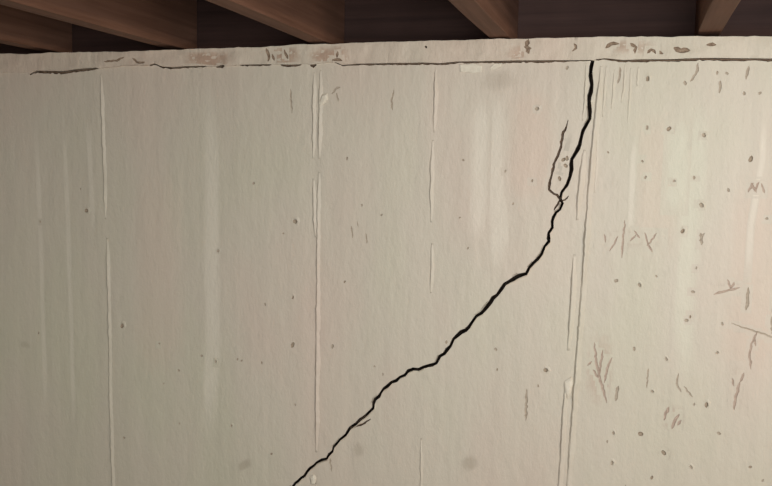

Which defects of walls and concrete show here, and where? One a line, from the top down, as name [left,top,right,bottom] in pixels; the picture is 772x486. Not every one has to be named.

crack [150,62,316,70]
crack [30,67,98,75]
crack [290,59,772,486]